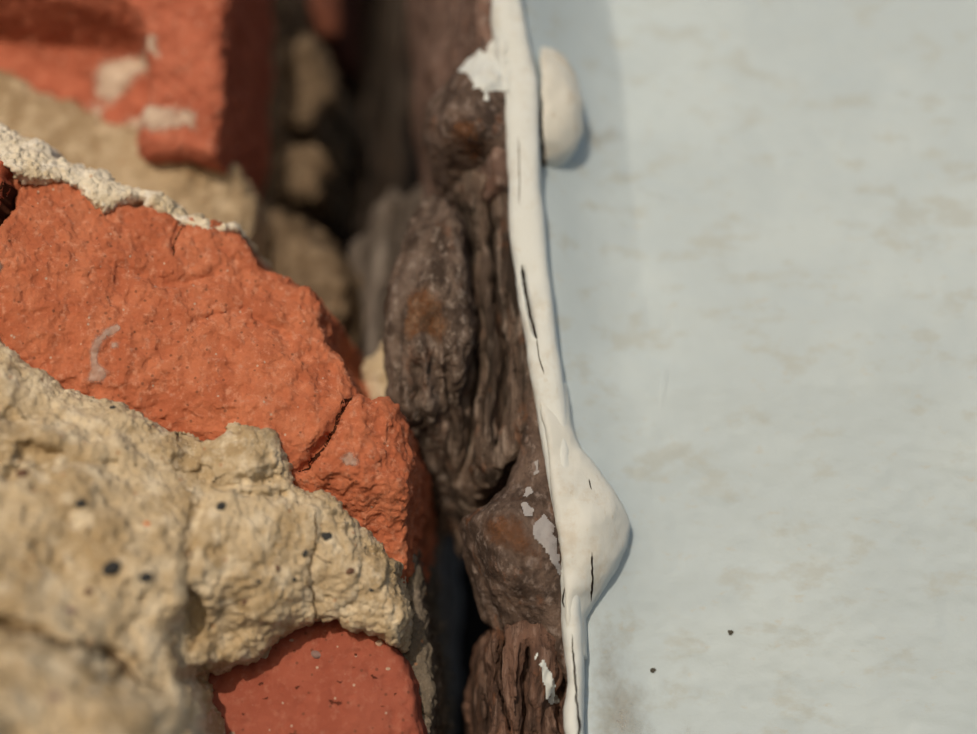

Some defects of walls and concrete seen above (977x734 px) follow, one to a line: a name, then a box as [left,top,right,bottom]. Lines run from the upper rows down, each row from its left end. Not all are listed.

crack [0,181,22,226]
crack [299,397,353,472]
peeling [521,487,562,575]